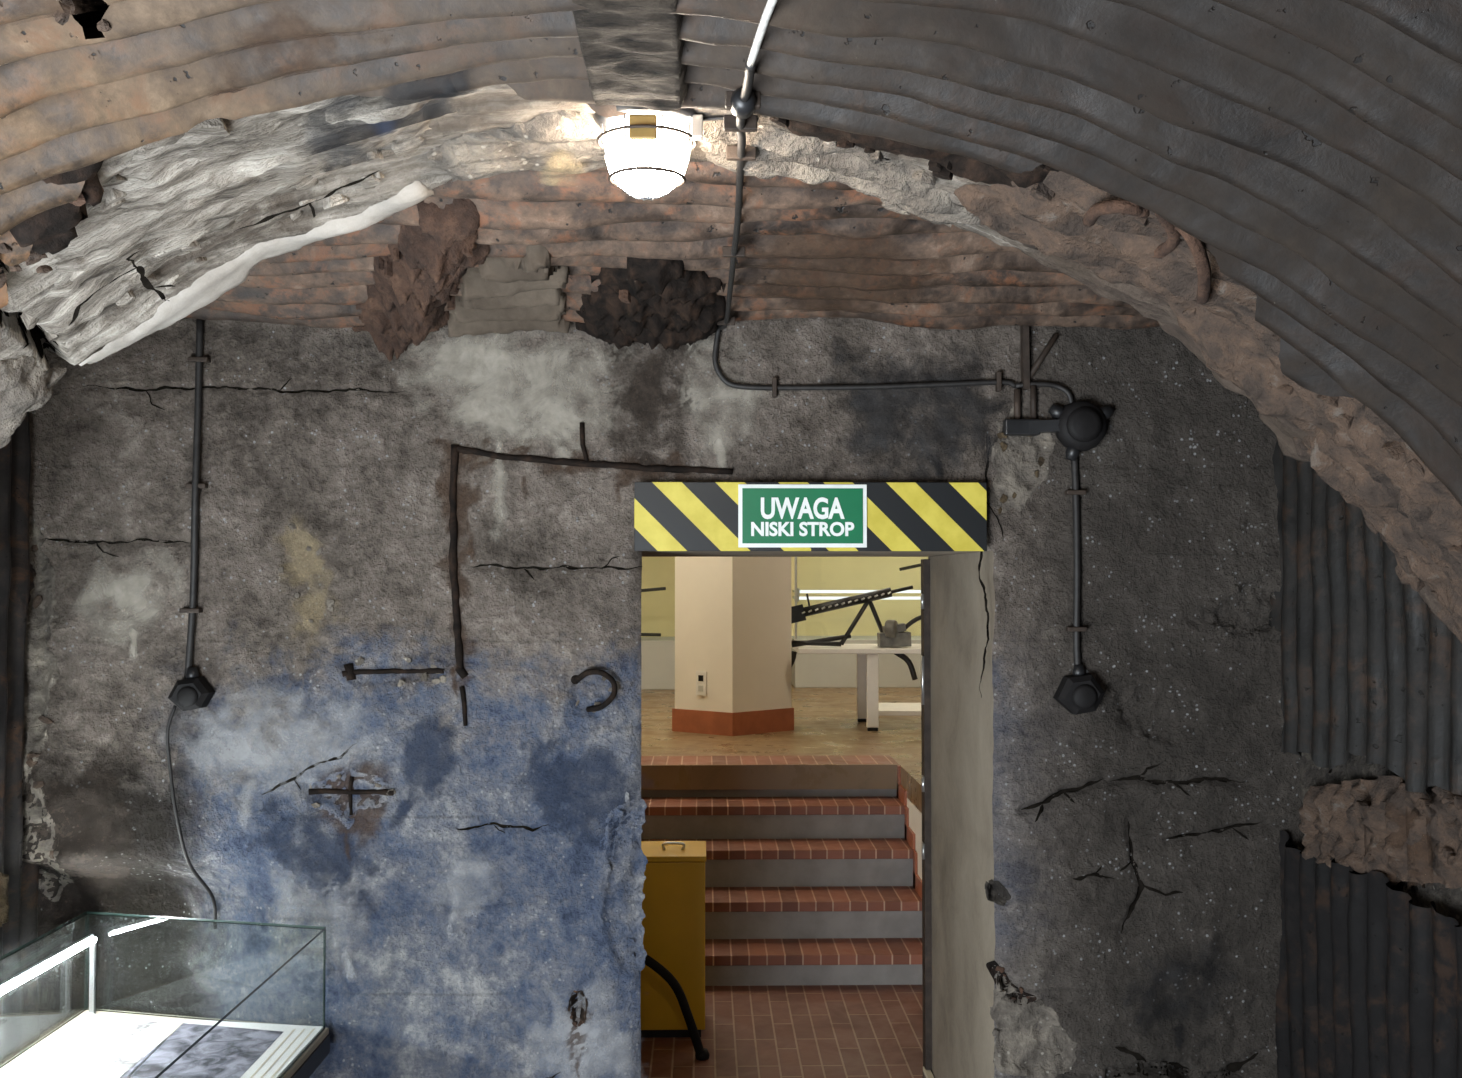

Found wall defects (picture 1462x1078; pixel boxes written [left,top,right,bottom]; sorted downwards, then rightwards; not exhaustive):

spalling [690,120,980,227]
spalling [0,95,605,448]
peeling [990,405,1055,514]
spalling [22,514,74,902]
spalling [334,648,450,694]
spalling [0,872,9,927]
spalling [302,766,398,829]
crack [1021,764,1244,822]
crack [1073,821,1261,933]
spalling [1298,775,1462,889]
spalling [990,966,1078,1078]